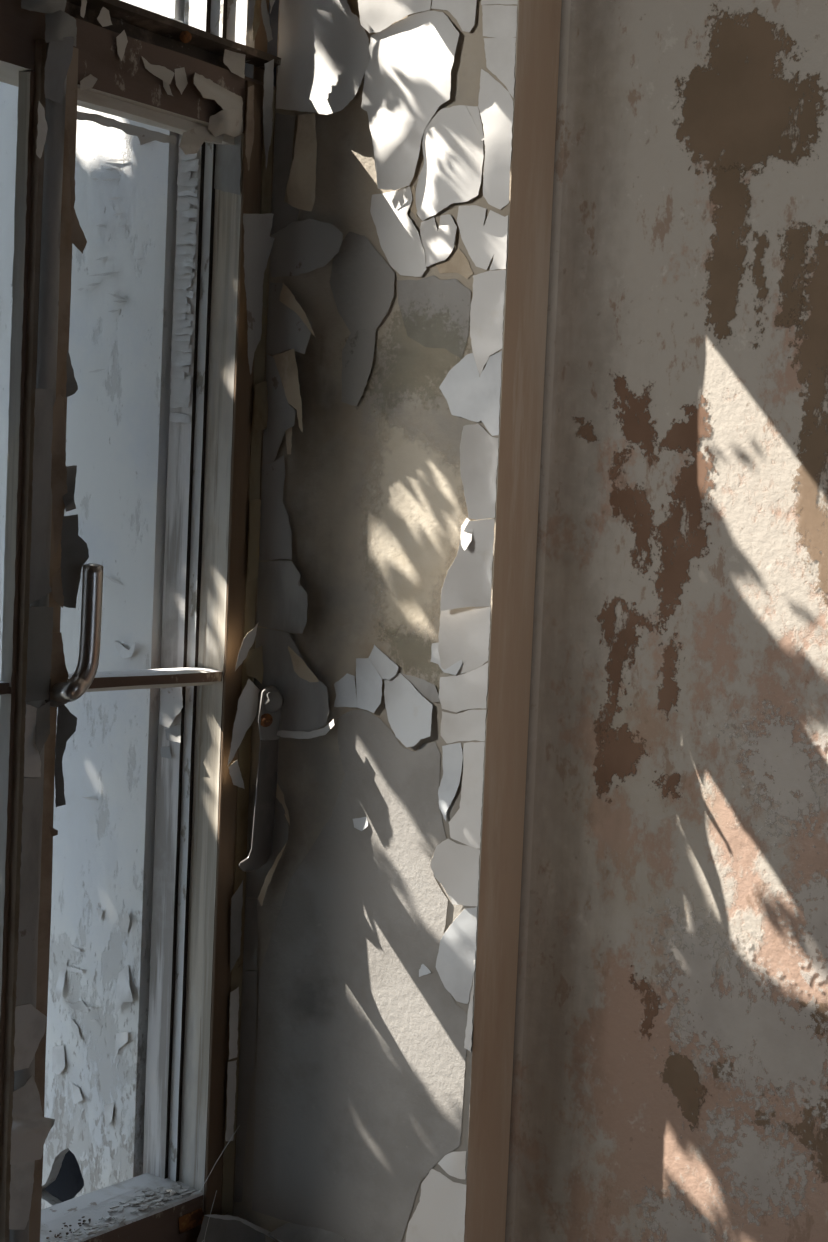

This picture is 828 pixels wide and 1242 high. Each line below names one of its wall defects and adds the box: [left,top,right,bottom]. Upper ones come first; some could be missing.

peeling [80,0,128,61]
peeling [142,57,188,96]
peeling [214,0,518,1052]
peeling [225,784,290,1202]
peeling [406,1151,466,1242]